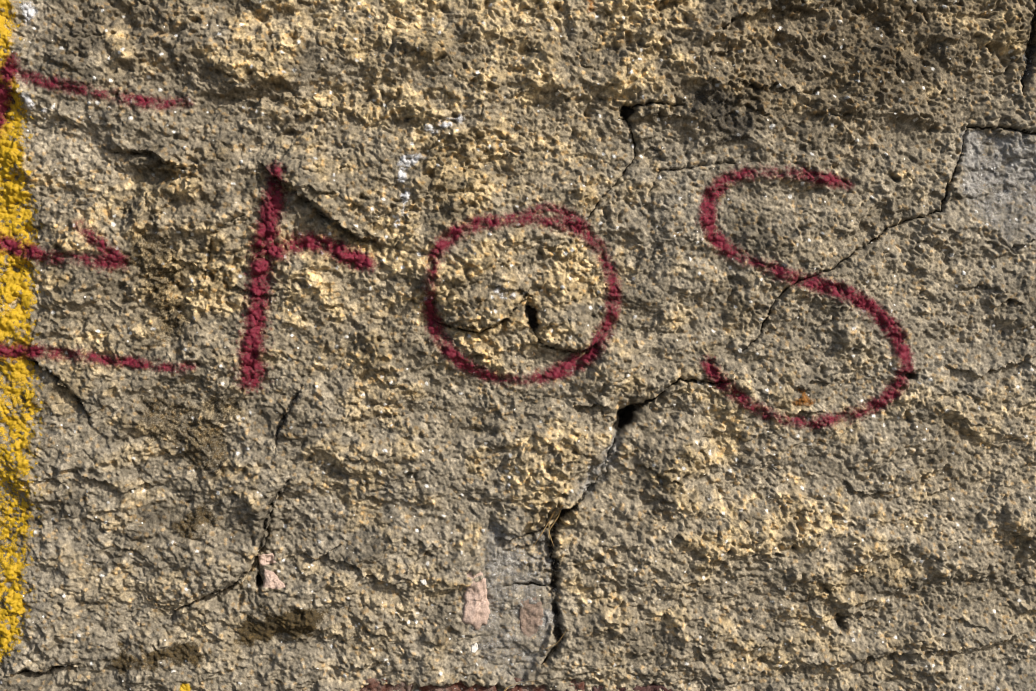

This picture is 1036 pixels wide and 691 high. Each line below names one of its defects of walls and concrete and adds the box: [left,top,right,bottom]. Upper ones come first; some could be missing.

crack [1020,10,1036,92]
crack [586,101,676,219]
crack [649,162,735,192]
crack [742,125,1036,352]
crack [433,318,507,334]
crack [275,386,302,450]
crack [607,378,722,455]
crack [184,480,289,607]
crack [506,487,588,665]